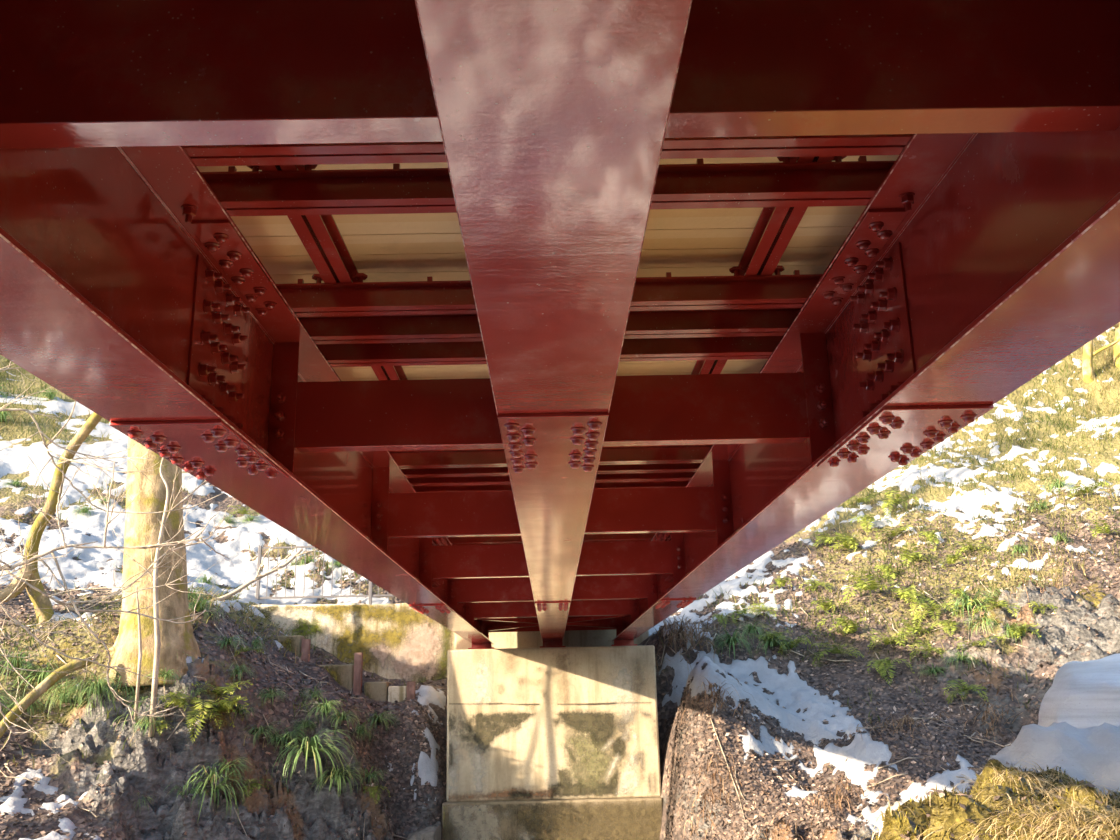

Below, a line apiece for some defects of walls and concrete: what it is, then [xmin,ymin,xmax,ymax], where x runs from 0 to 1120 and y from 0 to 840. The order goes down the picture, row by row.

damp [445,655,662,840]